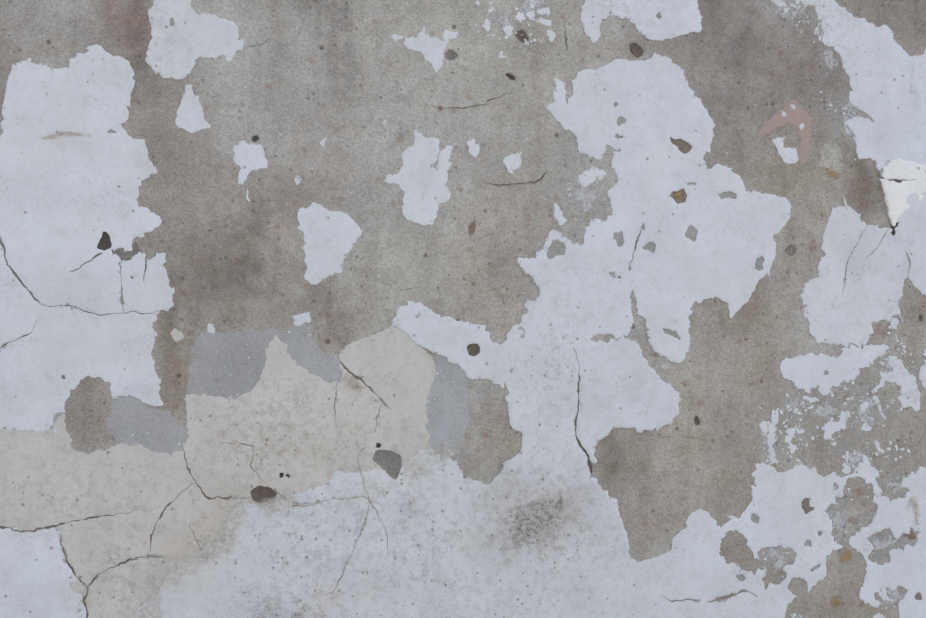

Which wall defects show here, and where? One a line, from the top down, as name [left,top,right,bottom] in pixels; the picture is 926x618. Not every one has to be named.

crack [0,240,160,349]
peeling [0,0,703,455]
peeling [590,0,926,558]
crack [334,362,391,432]
peeling [430,378,523,484]
crack [573,348,593,473]
crack [0,442,388,618]
peeling [719,530,796,589]
peeling [785,477,919,618]